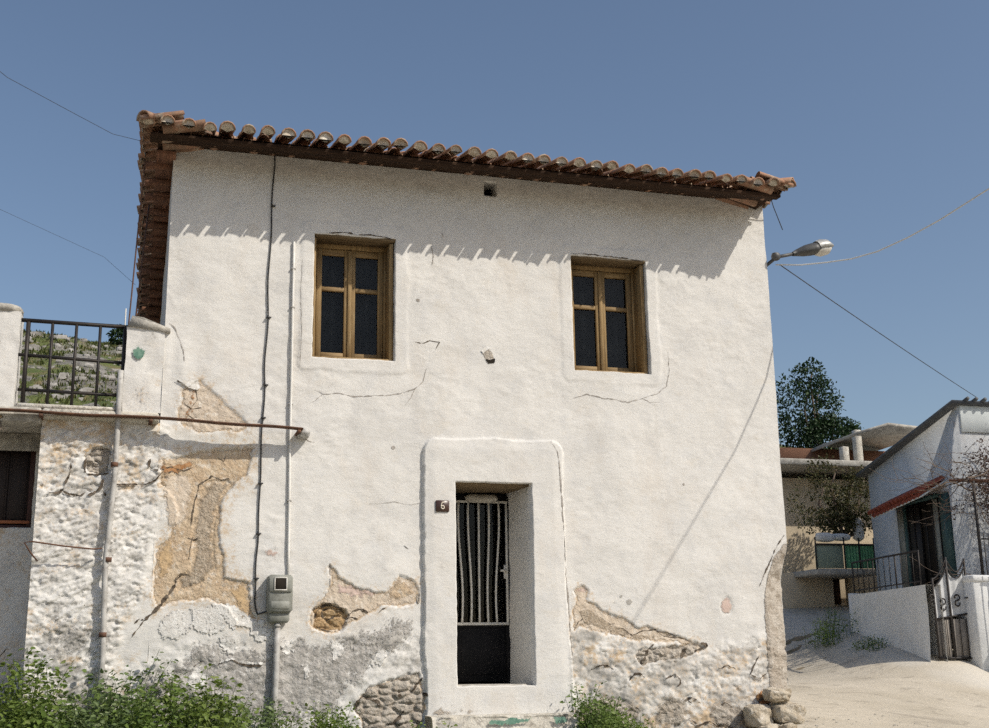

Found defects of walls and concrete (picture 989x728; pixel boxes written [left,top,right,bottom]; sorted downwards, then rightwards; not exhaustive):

flaking render [177,378,245,432]
crack [316,371,426,405]
crack [575,362,670,403]
flaking render [84,448,110,476]
flaking render [133,448,472,728]
flaking render [574,587,708,666]
flaking render [583,696,638,723]
flaking render [656,694,697,728]